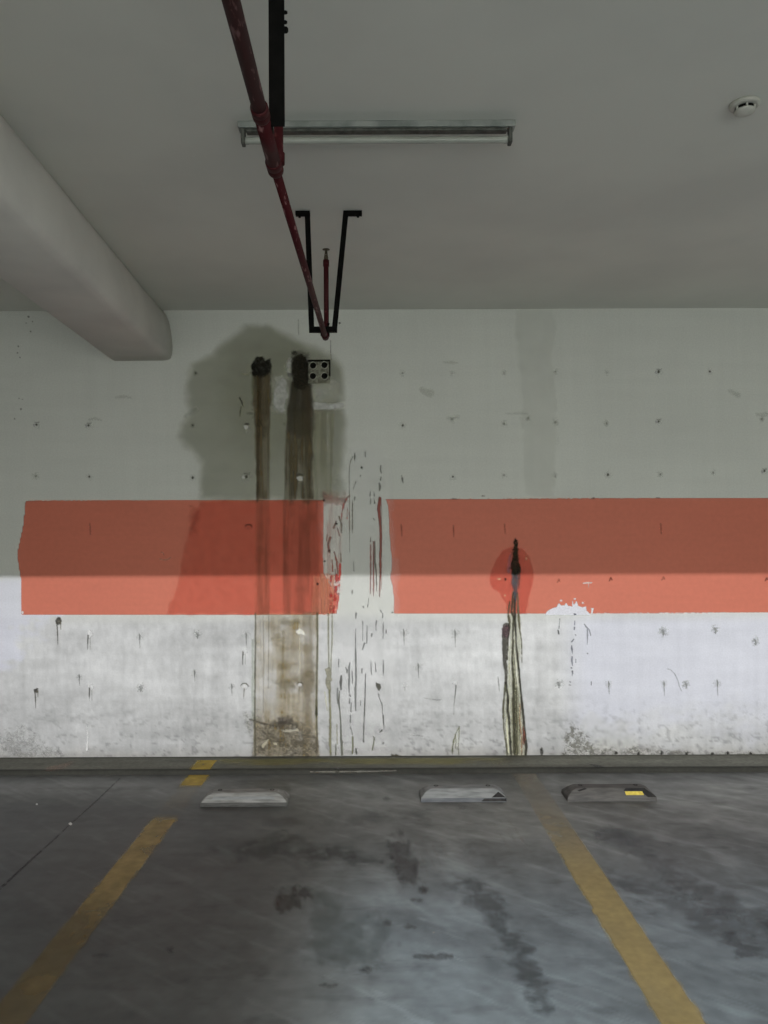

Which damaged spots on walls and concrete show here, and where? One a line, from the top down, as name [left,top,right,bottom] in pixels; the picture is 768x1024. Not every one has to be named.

damp [251,357,271,501]
damp [285,351,313,499]
corrosion [254,613,318,756]
peeling [546,598,594,683]